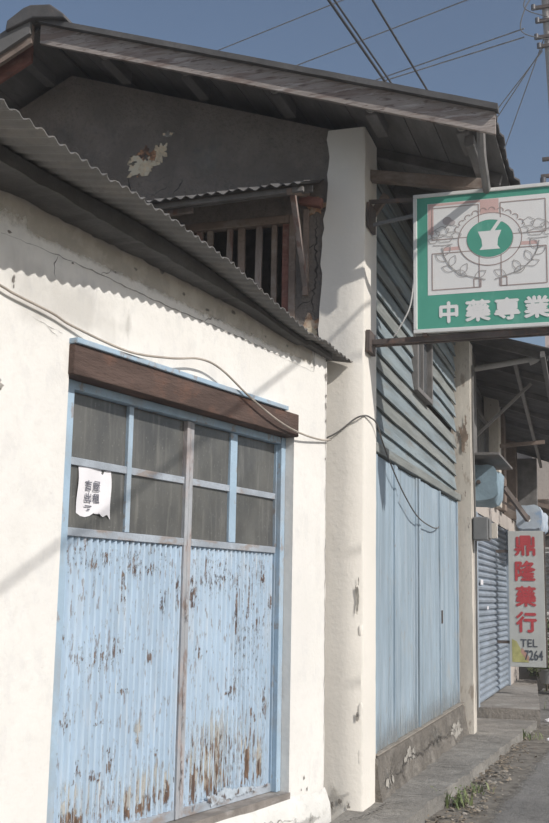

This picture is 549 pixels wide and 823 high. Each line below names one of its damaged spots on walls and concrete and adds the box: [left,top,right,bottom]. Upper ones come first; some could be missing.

spalling [127,130,174,178]
flaking render [303,313,319,336]
spalling [450,720,463,740]
rust [163,726,219,805]
rust [241,738,261,784]
rust [60,786,81,823]
rust [123,775,148,818]